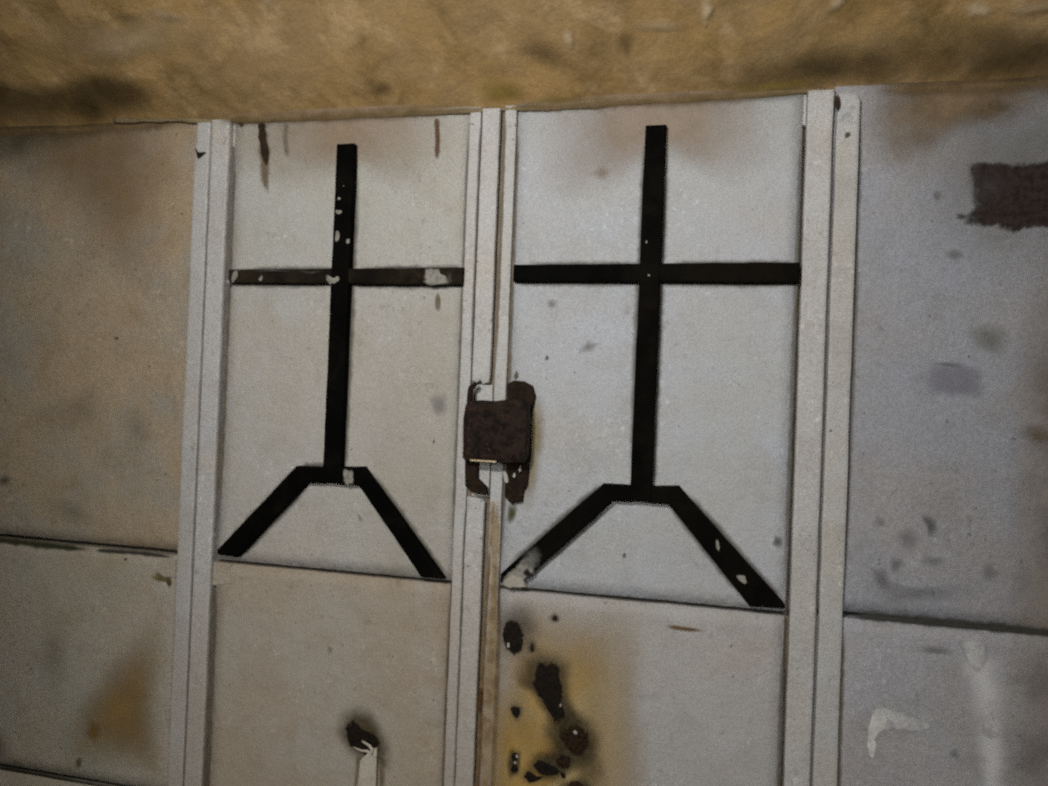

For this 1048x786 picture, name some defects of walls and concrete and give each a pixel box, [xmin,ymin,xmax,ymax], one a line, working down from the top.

corrosion [258,122,268,188]
peeling [959,162,1048,232]
corrosion [528,412,539,483]
corrosion [475,502,629,786]